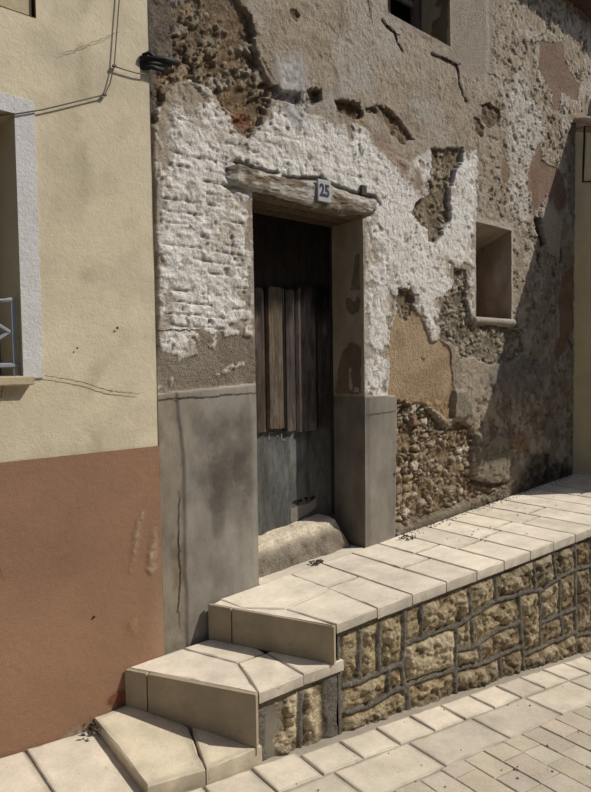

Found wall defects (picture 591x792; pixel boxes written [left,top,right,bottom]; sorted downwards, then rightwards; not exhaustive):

spalling [148,0,323,139]
spalling [334,98,415,145]
crack [367,0,402,51]
crack [431,54,466,102]
spalling [412,146,465,244]
peeling [528,144,566,265]
crack [45,375,140,394]
crack [159,392,258,401]
peeling [335,342,361,395]
peeling [388,267,527,422]
peeling [554,262,574,360]
crack [175,495,183,621]